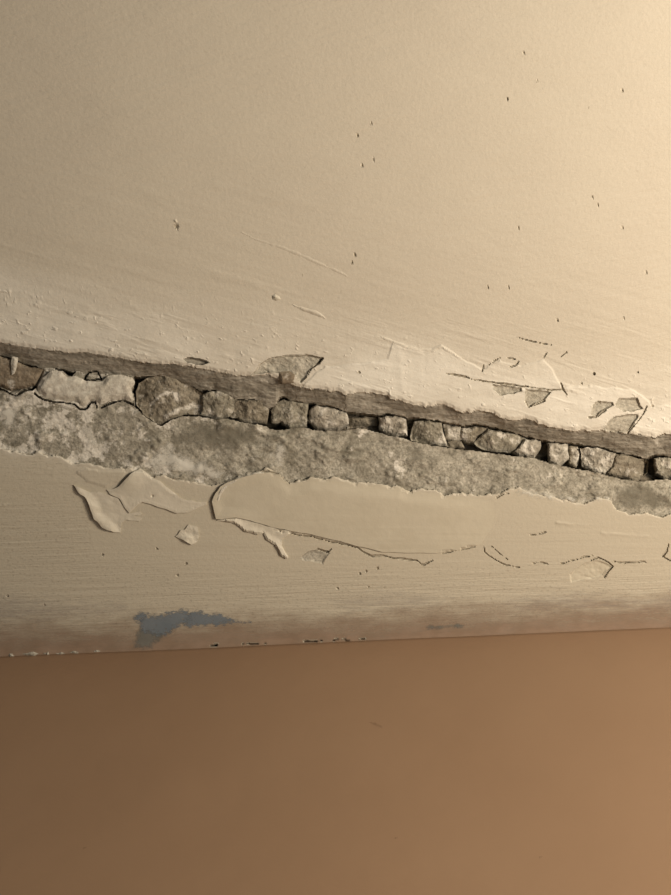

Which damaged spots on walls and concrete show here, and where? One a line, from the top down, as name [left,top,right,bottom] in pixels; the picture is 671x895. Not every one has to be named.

crack [0,355,216,415]
spalling [0,343,671,565]
crack [229,396,671,482]
crack [291,533,587,567]
crack [616,544,670,564]